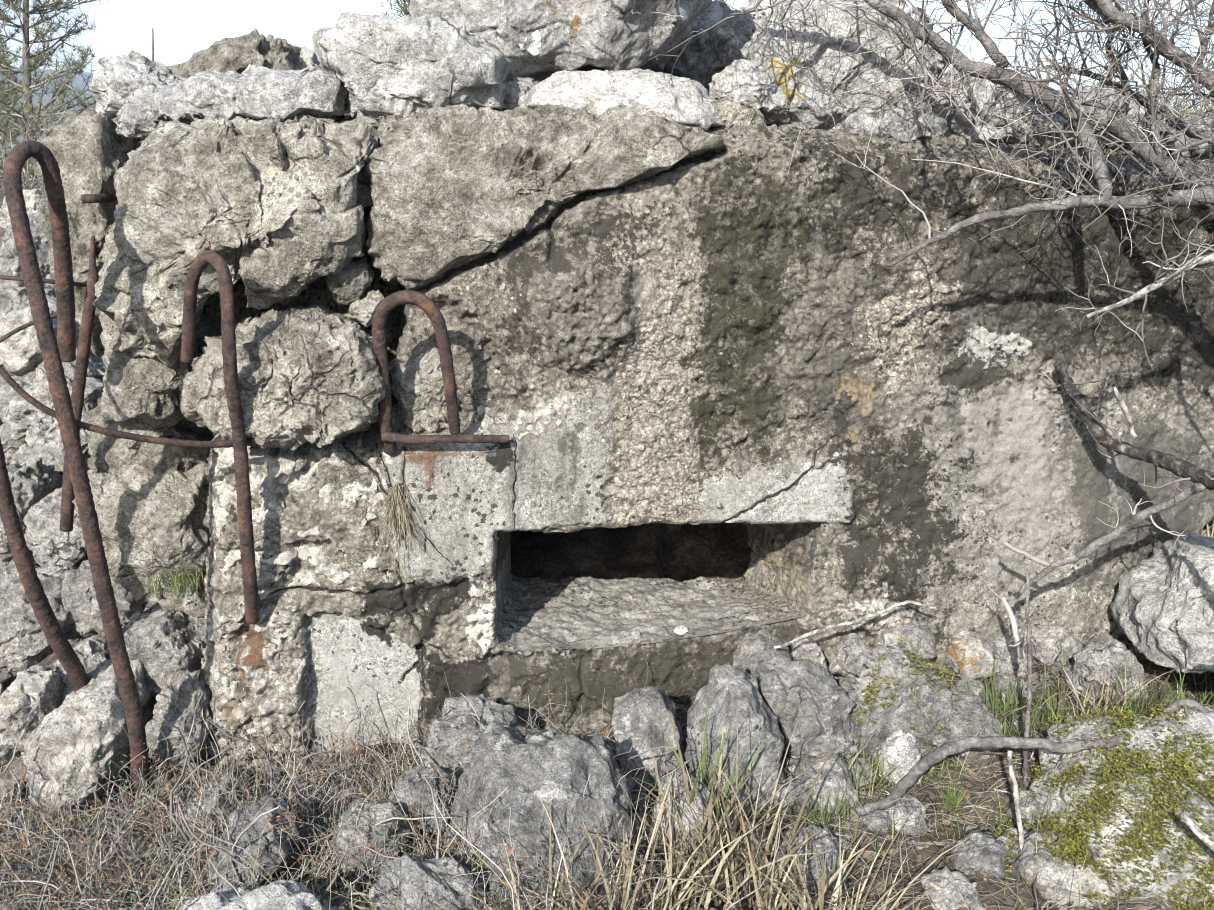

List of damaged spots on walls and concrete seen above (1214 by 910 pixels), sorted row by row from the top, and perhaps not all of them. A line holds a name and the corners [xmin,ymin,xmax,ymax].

damp [485,187,673,376]
corrosion [0,140,266,792]
corrosion [371,290,509,488]
crack [723,437,842,522]
damp [673,128,1214,644]